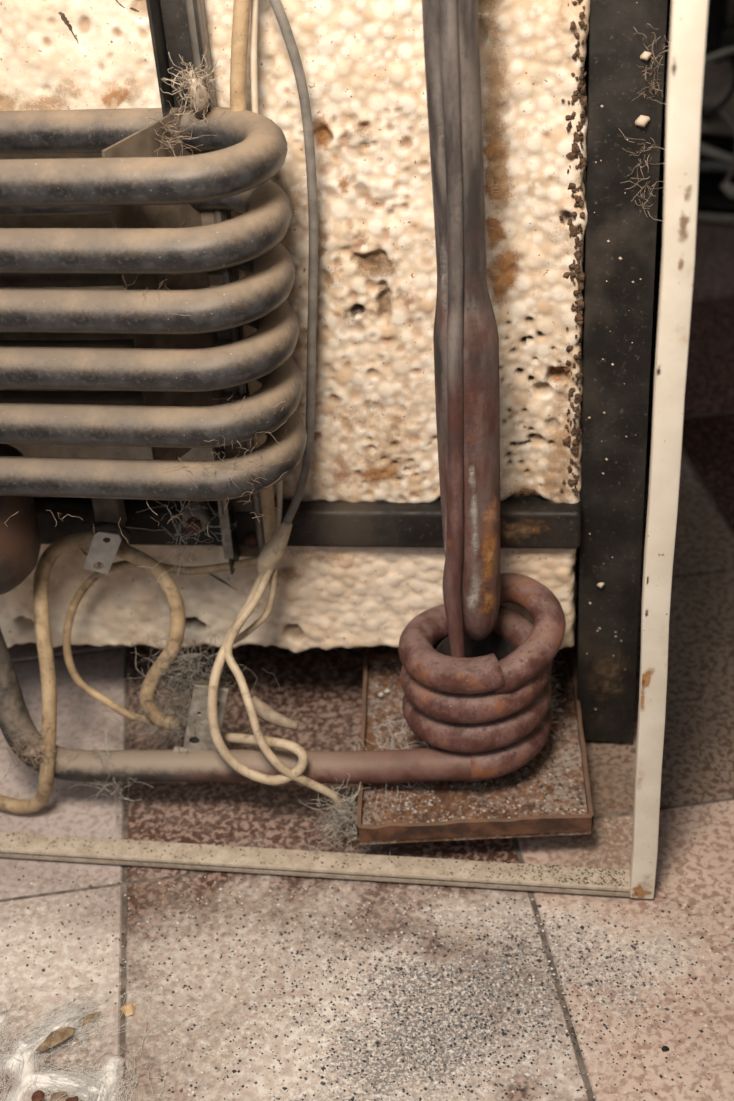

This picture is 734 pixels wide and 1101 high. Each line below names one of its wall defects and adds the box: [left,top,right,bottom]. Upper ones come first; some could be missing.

corrosion [483,59,519,303]